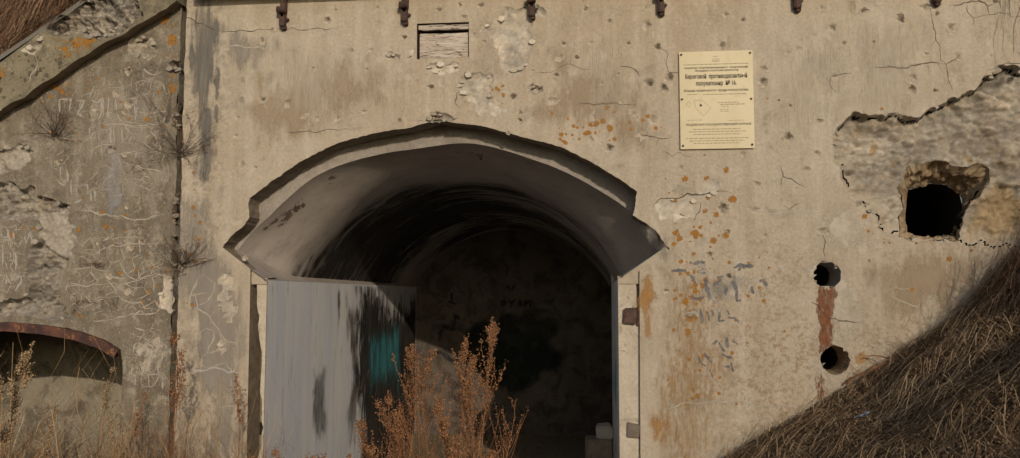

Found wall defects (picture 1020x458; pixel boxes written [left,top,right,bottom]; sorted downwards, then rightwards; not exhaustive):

spalling [21,0,158,76]
spalling [166,60,184,74]
spalling [385,34,415,61]
spalling [425,3,558,123]
crack [876,0,1020,88]
spalling [418,111,459,123]
spalling [832,65,1020,251]
spalling [0,144,77,324]
spalling [654,177,731,222]
corrosion [816,286,838,354]